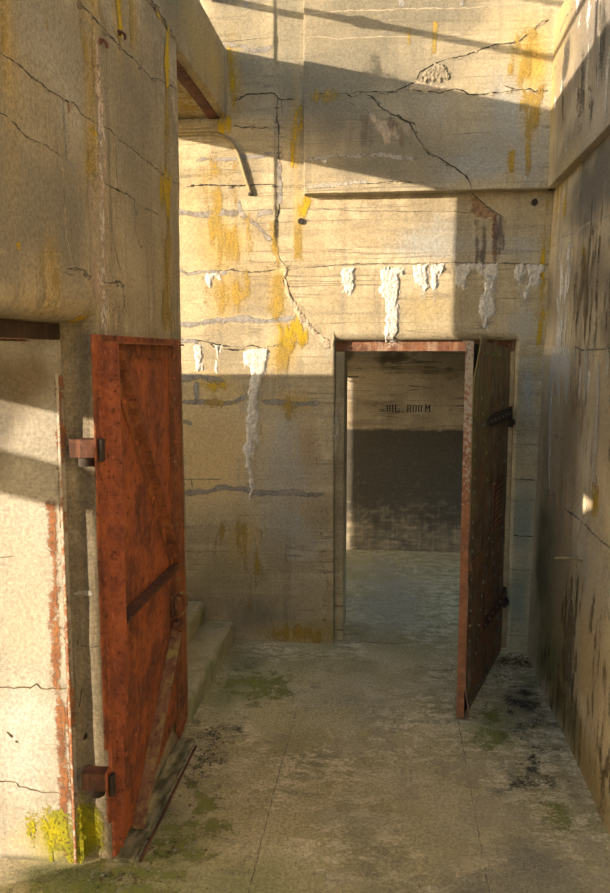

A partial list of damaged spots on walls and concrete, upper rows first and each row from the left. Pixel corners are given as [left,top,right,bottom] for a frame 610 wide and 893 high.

crack [0,0,574,351]
damp [507,88,544,177]
damp [554,35,570,123]
damp [565,0,610,139]
damp [341,267,355,296]
damp [379,217,505,347]
damp [238,349,271,500]
corrosion [45,375,78,861]